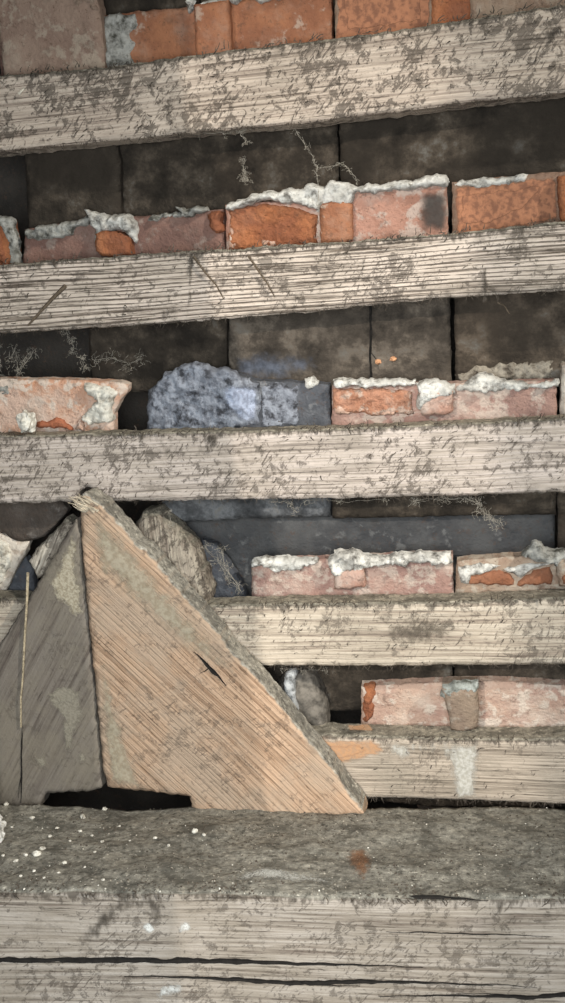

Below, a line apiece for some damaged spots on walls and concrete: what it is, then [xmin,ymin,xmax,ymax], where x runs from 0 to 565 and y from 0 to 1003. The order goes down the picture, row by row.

crack [0,957,565,1000]